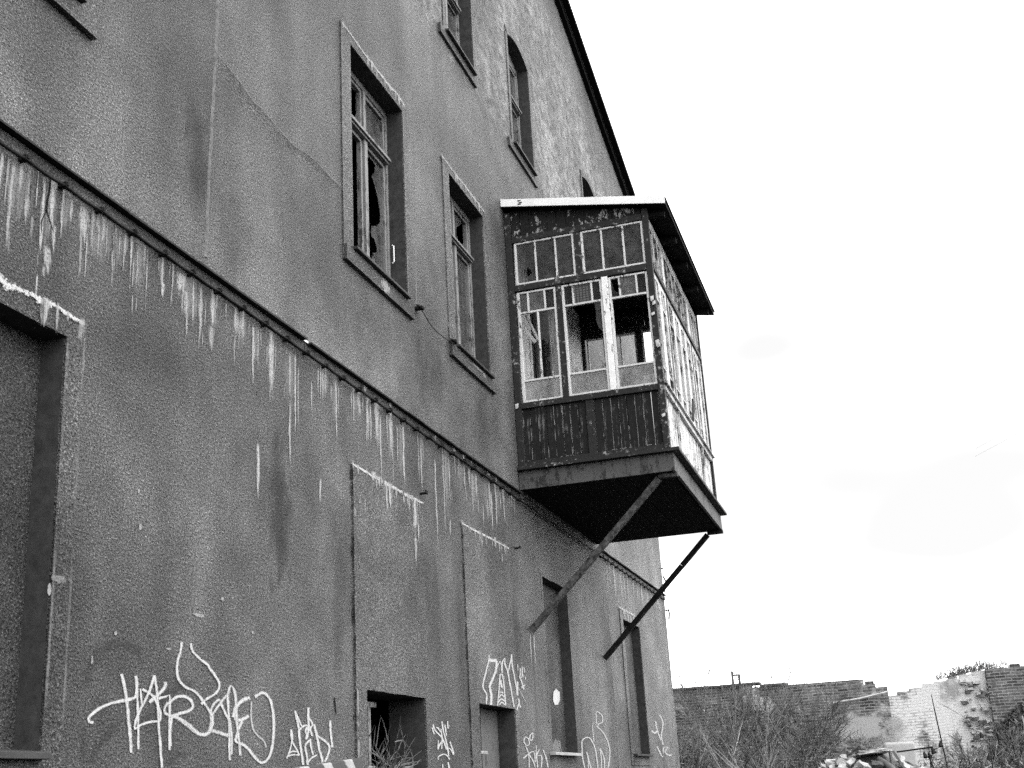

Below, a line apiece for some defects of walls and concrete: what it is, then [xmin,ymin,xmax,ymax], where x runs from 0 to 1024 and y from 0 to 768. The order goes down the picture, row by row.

efflorescence [0,154,148,333]
efflorescence [161,259,276,391]
efflorescence [288,355,299,453]
efflorescence [311,366,515,559]
spalling [959,679,995,754]